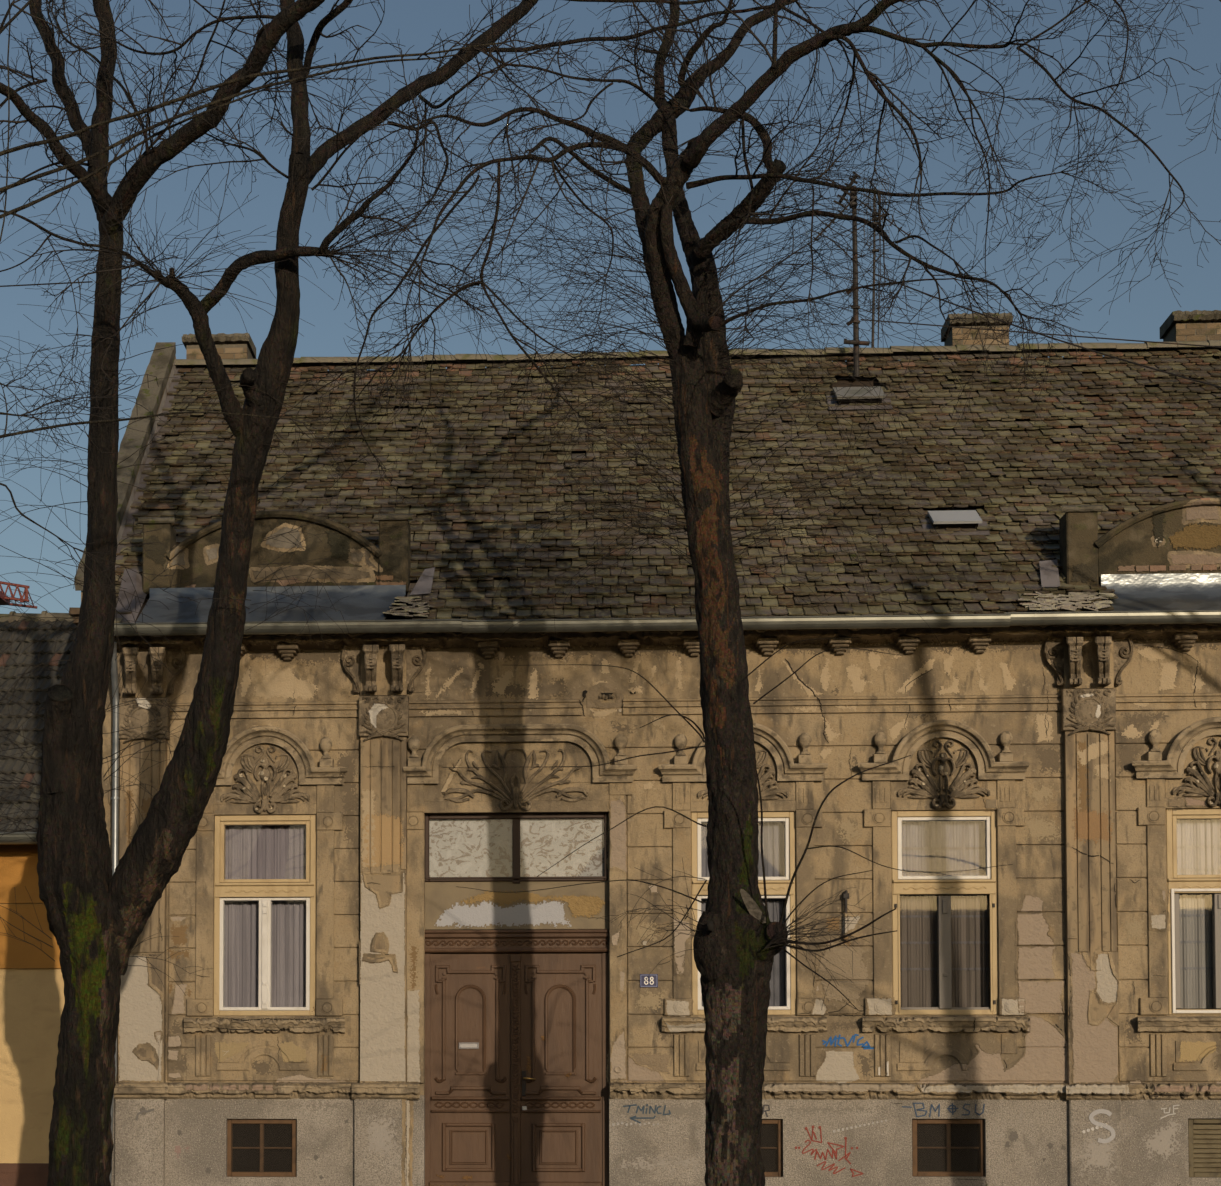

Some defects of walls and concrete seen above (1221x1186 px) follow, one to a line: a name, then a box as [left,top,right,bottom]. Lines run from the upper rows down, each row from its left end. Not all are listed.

peeling [203,544,220,565]
peeling [249,523,406,586]
peeling [419,663,514,717]
peeling [528,668,539,700]
peeling [781,652,902,759]
peeling [896,654,965,710]
peeling [1165,763,1219,811]
peeling [434,900,572,928]
peeling [607,913,695,978]
spalling [115,789,424,1186]
peeling [616,967,706,1036]
peeling [762,887,1221,1098]